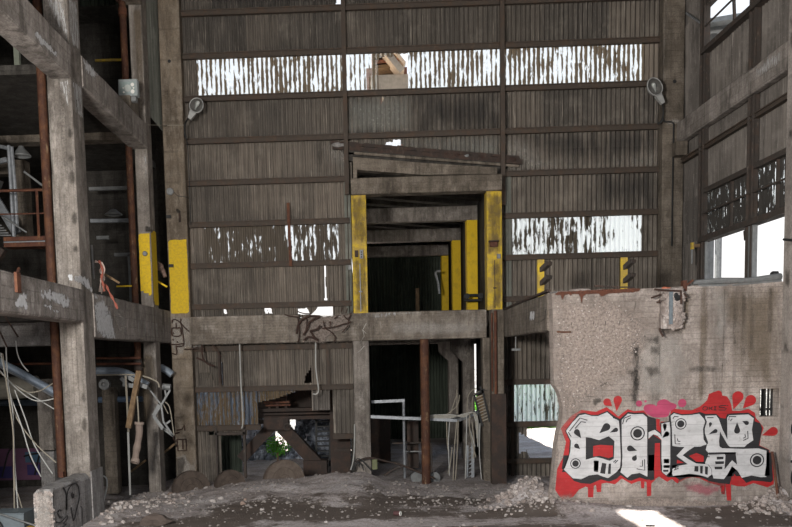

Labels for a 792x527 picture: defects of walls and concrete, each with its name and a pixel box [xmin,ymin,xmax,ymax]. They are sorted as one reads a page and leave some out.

peeling [15,292,28,309]
peeling [41,289,70,313]
peeling [68,274,116,339]
corrosion [555,288,640,303]